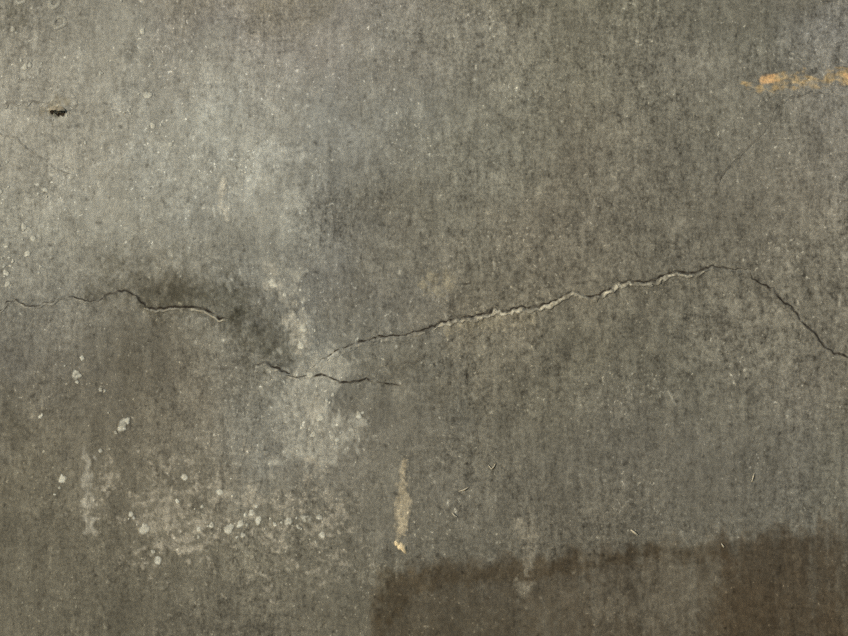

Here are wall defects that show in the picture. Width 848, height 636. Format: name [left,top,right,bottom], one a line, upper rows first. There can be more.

peeling [757,70,781,86]
crack [0,99,46,109]
crack [0,133,73,175]
crack [0,289,228,322]
crack [254,264,848,386]
water stain [47,233,848,636]